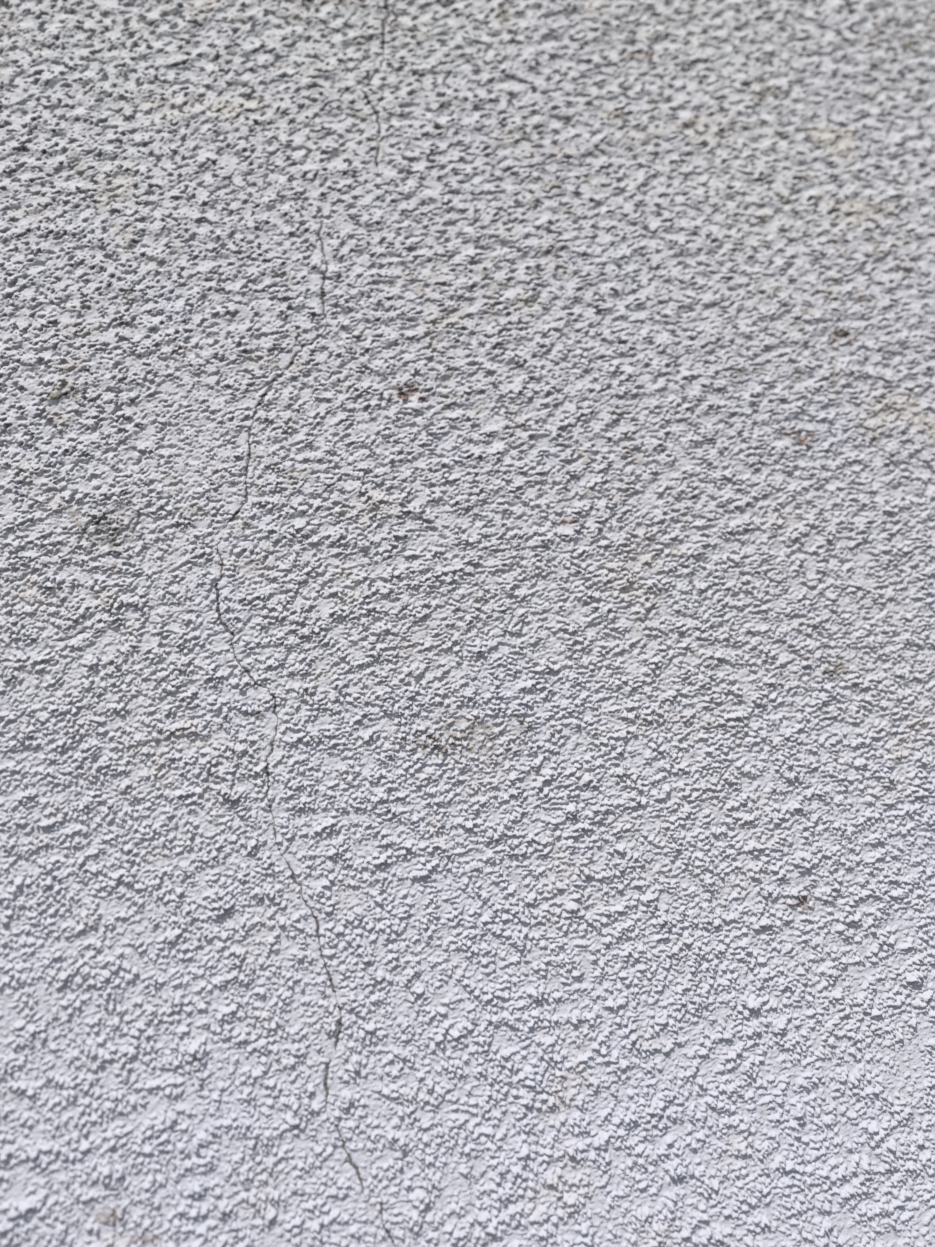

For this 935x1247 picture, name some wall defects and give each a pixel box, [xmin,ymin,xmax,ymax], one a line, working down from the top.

crack [348,0,391,195]
crack [174,218,395,1246]